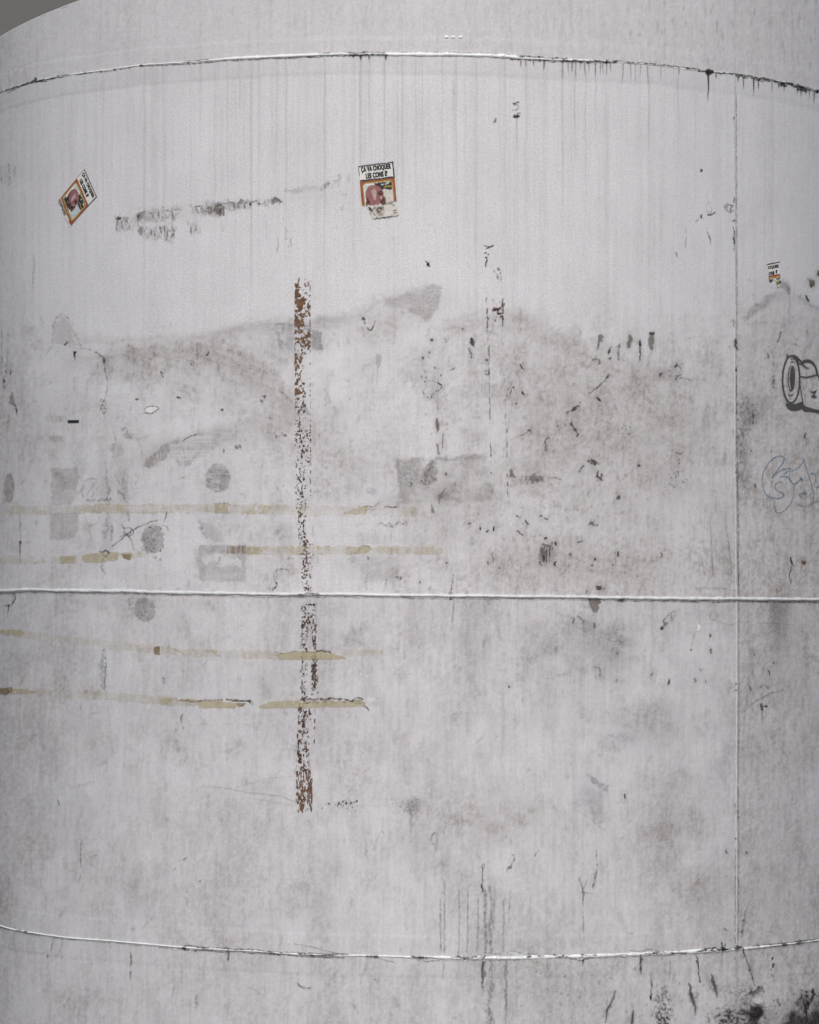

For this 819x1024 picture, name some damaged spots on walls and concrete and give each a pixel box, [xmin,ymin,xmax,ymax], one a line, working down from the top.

damp [511,55,819,94]
corrosion [294,278,318,813]
damp [716,986,764,1024]
damp [780,989,819,1024]